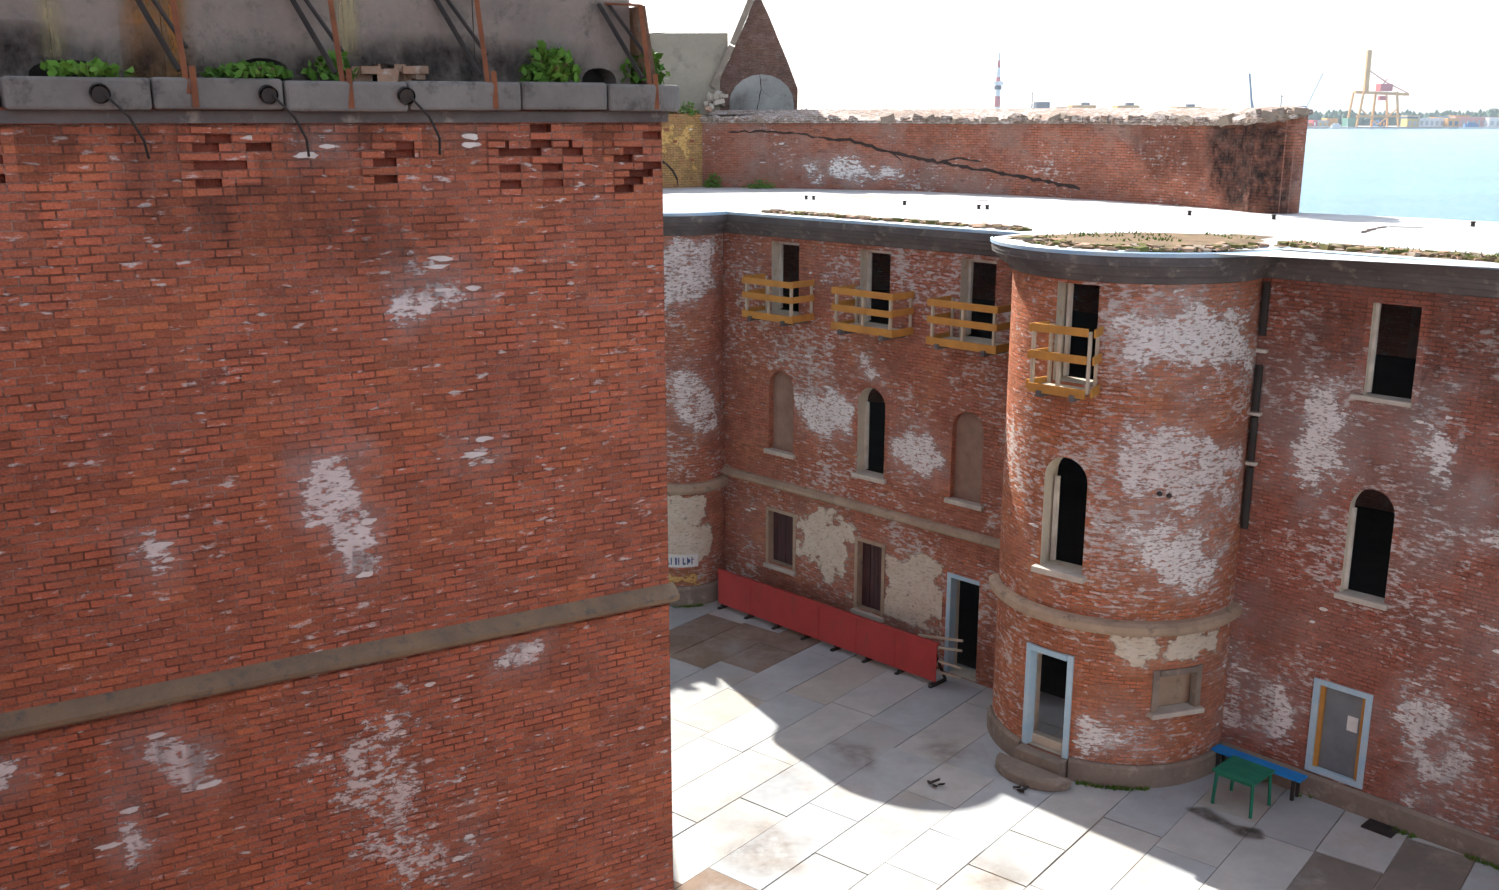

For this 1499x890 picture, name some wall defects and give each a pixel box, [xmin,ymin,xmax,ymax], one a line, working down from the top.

spalling [176,126,272,188]
spalling [486,122,583,188]
spalling [603,124,699,193]
crack [729,74,1080,201]
damp [386,251,482,325]
damp [297,455,382,578]
flaking render [667,495,713,585]
flaking render [796,506,857,599]
flaking render [884,544,944,635]
damp [1090,421,1246,596]
damp [1386,681,1477,808]
damp [295,710,480,890]